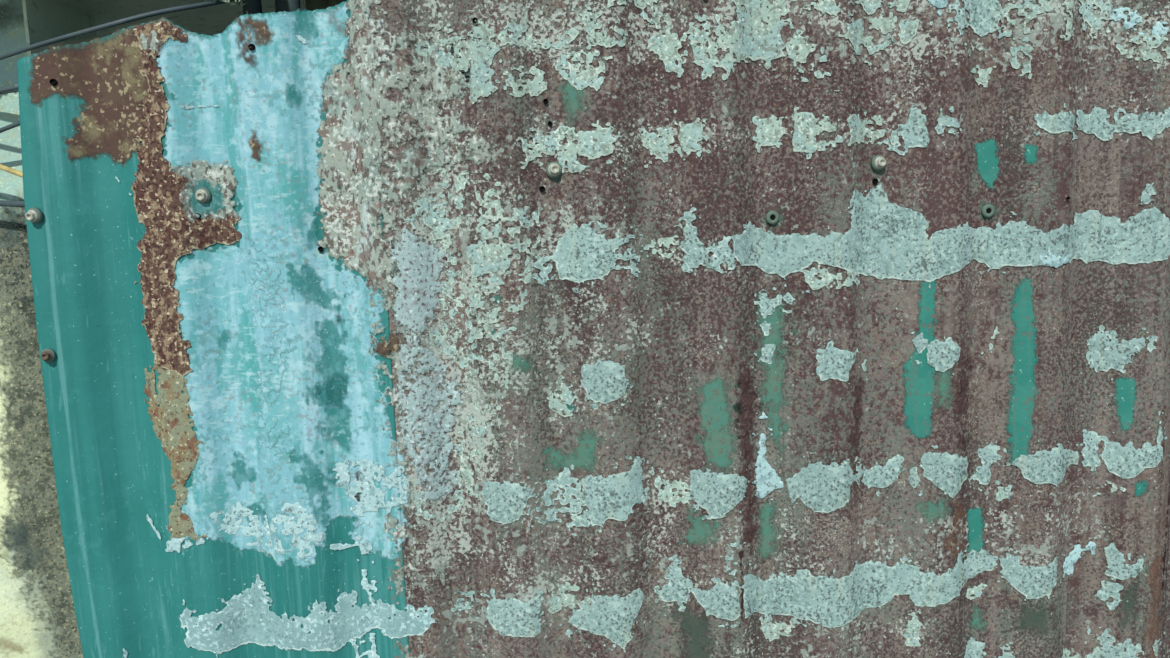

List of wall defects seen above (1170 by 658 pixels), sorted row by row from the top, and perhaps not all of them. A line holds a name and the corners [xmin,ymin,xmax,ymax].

rust [28,24,160,165]
peeling [140,0,1170,594]
leakage [0,206,84,658]
rust [373,334,399,357]
rust [847,378,865,473]
rust [952,355,973,420]
rust [731,355,764,619]
peeling [178,569,437,658]
peeling [450,537,1145,652]
peeling [946,637,1015,658]
peeling [1062,627,1162,658]